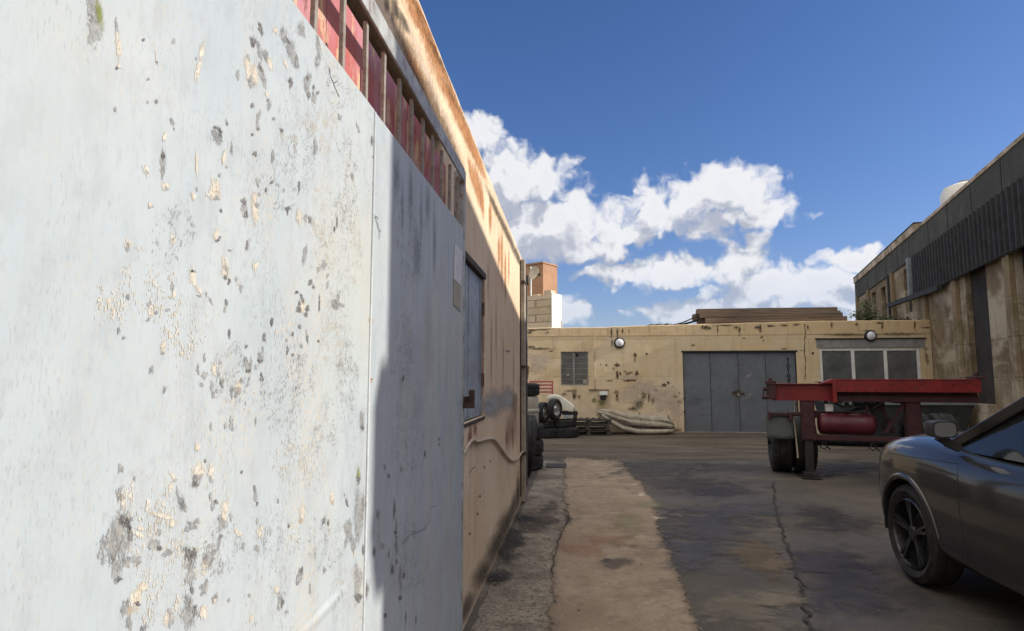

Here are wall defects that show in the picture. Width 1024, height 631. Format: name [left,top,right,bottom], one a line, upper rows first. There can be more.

peeling [191,119,233,213]
peeling [236,21,345,163]
corrosion [406,0,492,227]
peeling [95,178,365,399]
peeling [96,443,263,631]
peeling [274,585,289,615]
crack [772,482,816,631]